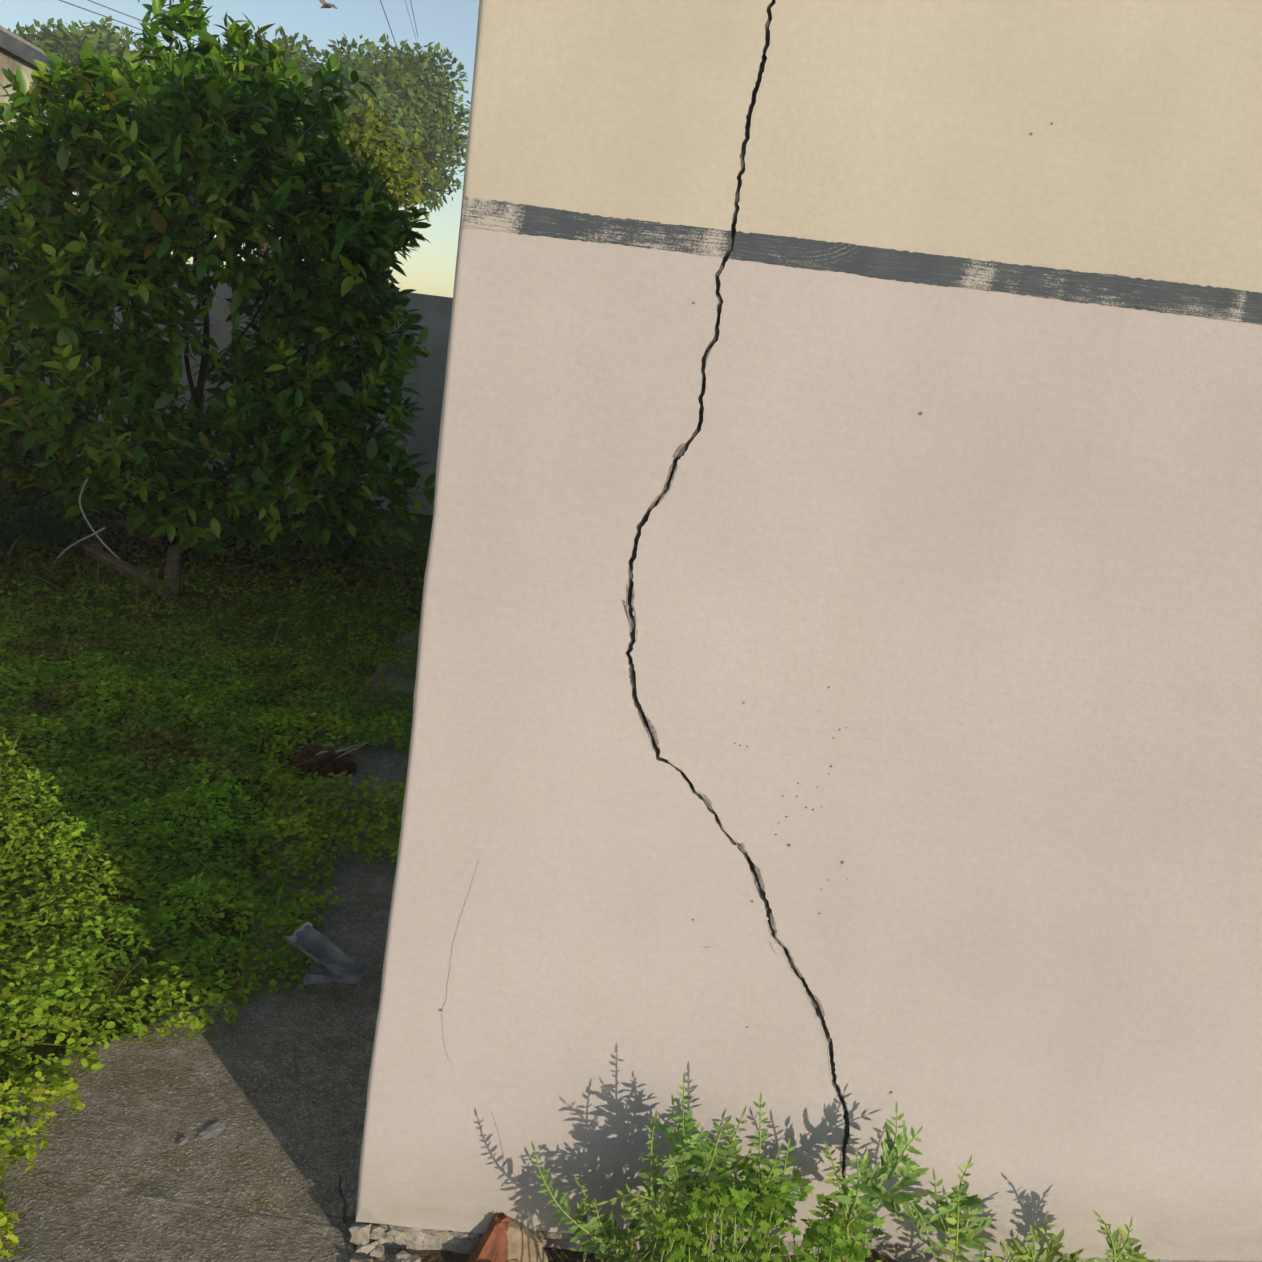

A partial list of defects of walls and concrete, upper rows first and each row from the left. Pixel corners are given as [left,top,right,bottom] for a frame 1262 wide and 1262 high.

crack [622,0,851,1239]